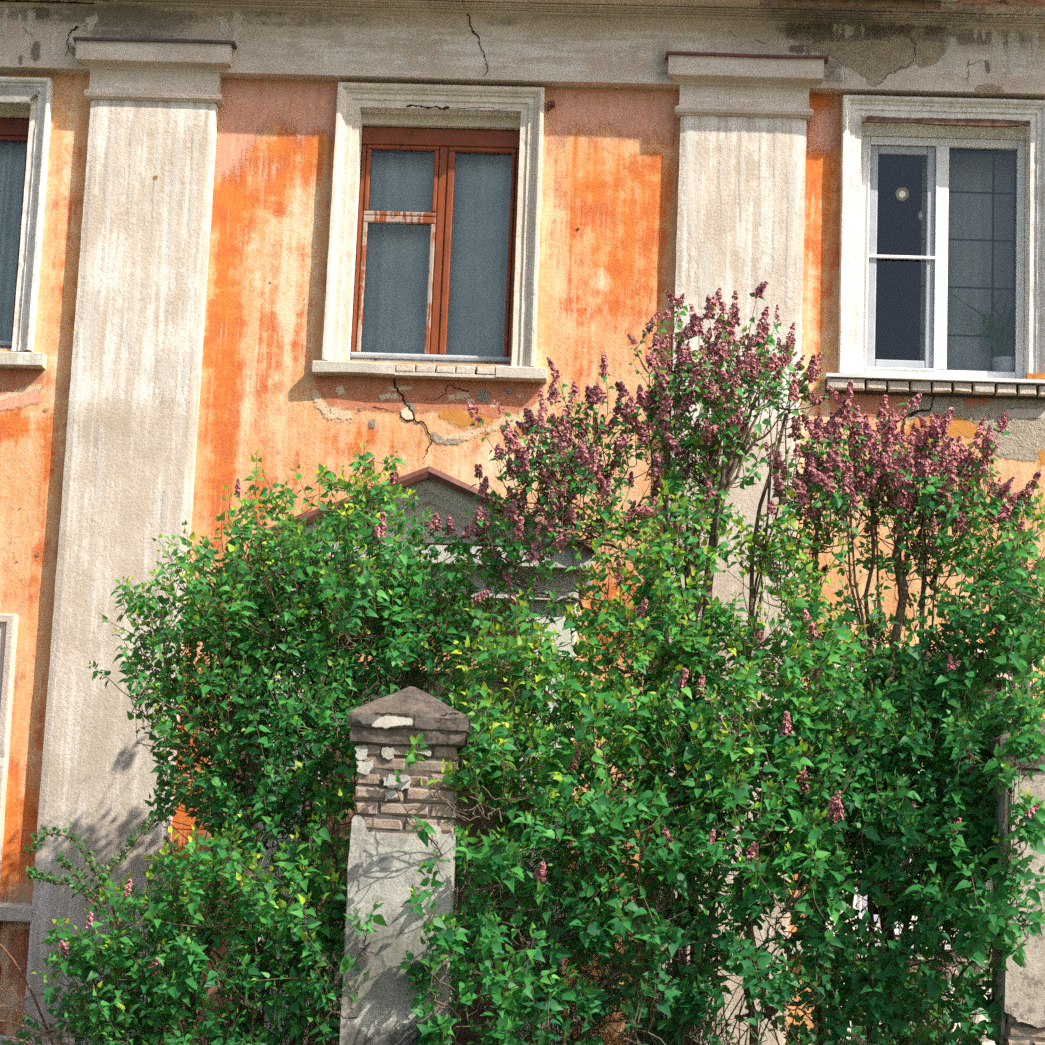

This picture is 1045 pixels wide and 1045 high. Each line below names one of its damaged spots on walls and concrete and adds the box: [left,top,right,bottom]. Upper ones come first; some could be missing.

spalling [6,0,114,31]
crack [462,0,488,77]
peeling [789,36,946,86]
peeling [0,368,44,411]
crack [373,378,469,464]
peeling [308,376,543,441]
spalling [827,393,1045,466]
peeling [372,716,413,728]